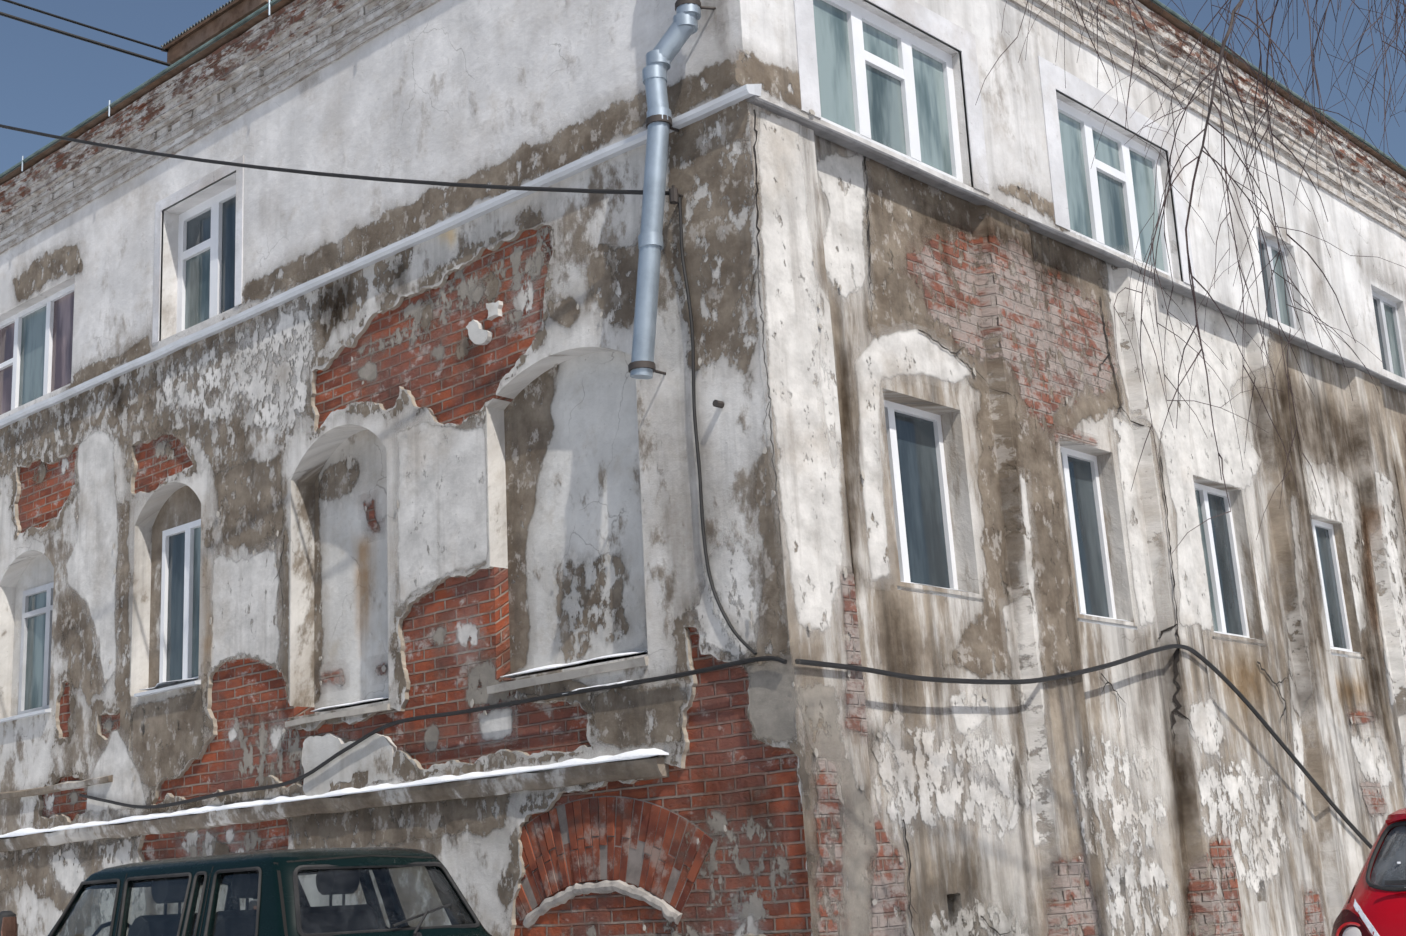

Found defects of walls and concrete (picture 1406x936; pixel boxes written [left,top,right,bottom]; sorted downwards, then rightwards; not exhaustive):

peeling [667,50,815,117]
spalling [0,91,862,936]
peeling [817,153,1271,936]
peeling [1047,461,1406,936]
damp [1253,388,1362,462]
damp [1357,486,1388,735]